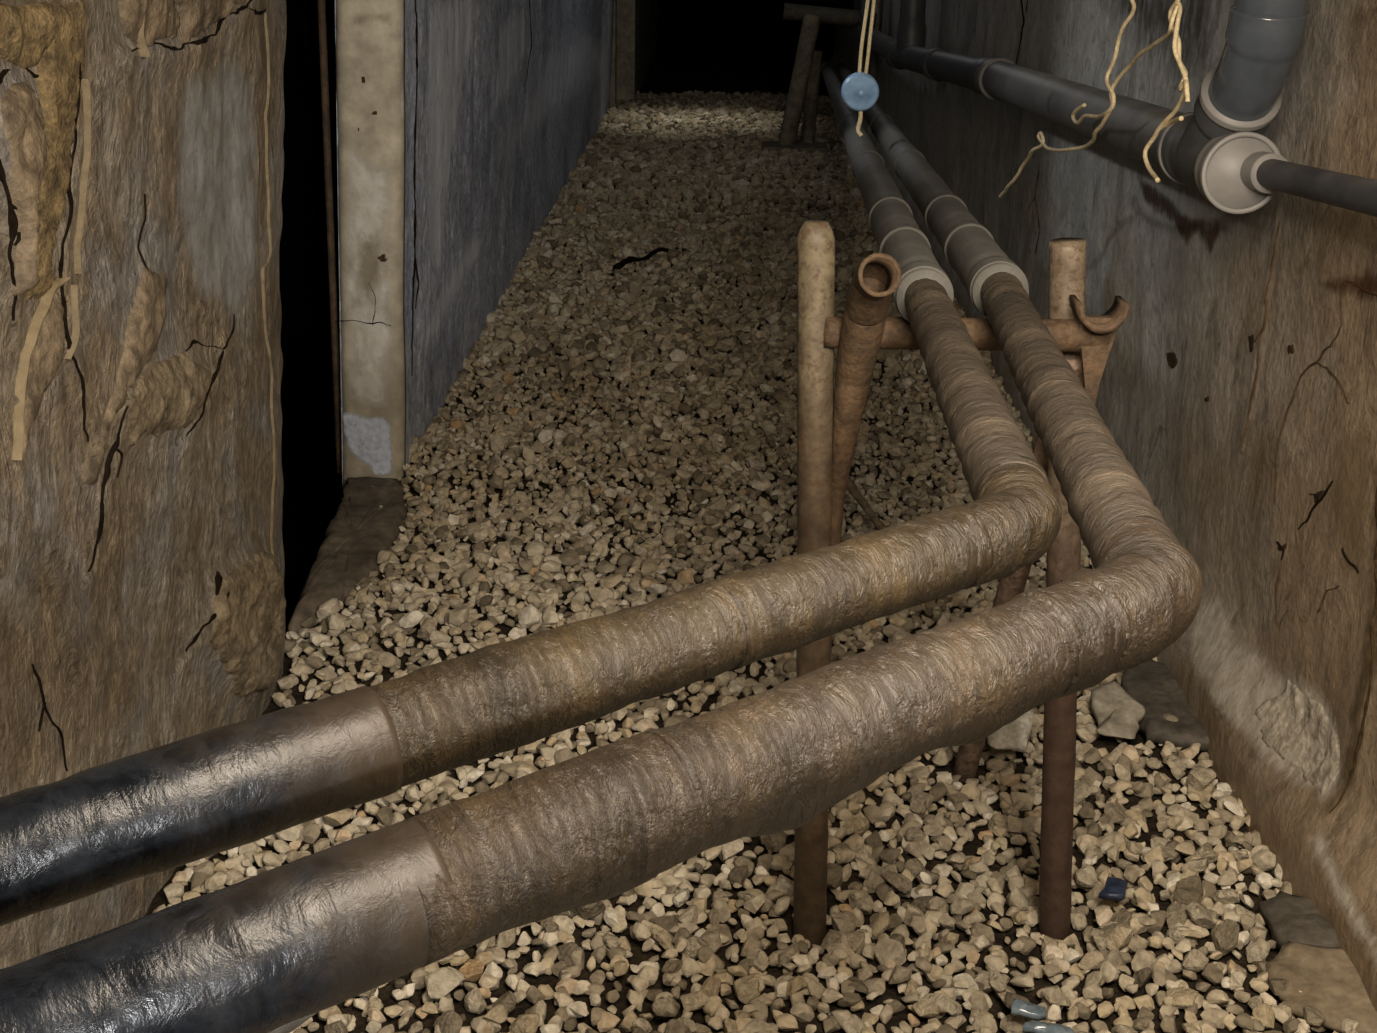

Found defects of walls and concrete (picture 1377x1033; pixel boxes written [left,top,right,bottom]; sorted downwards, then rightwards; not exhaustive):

crack [0,67,39,84]
flaking render [118,0,246,47]
crack [132,0,266,51]
crack [0,159,21,321]
spalling [0,0,85,455]
crack [58,62,129,572]
crack [185,314,235,436]
crack [1240,221,1376,504]
crack [1275,480,1334,622]
crack [1317,548,1360,613]
crack [31,664,68,771]